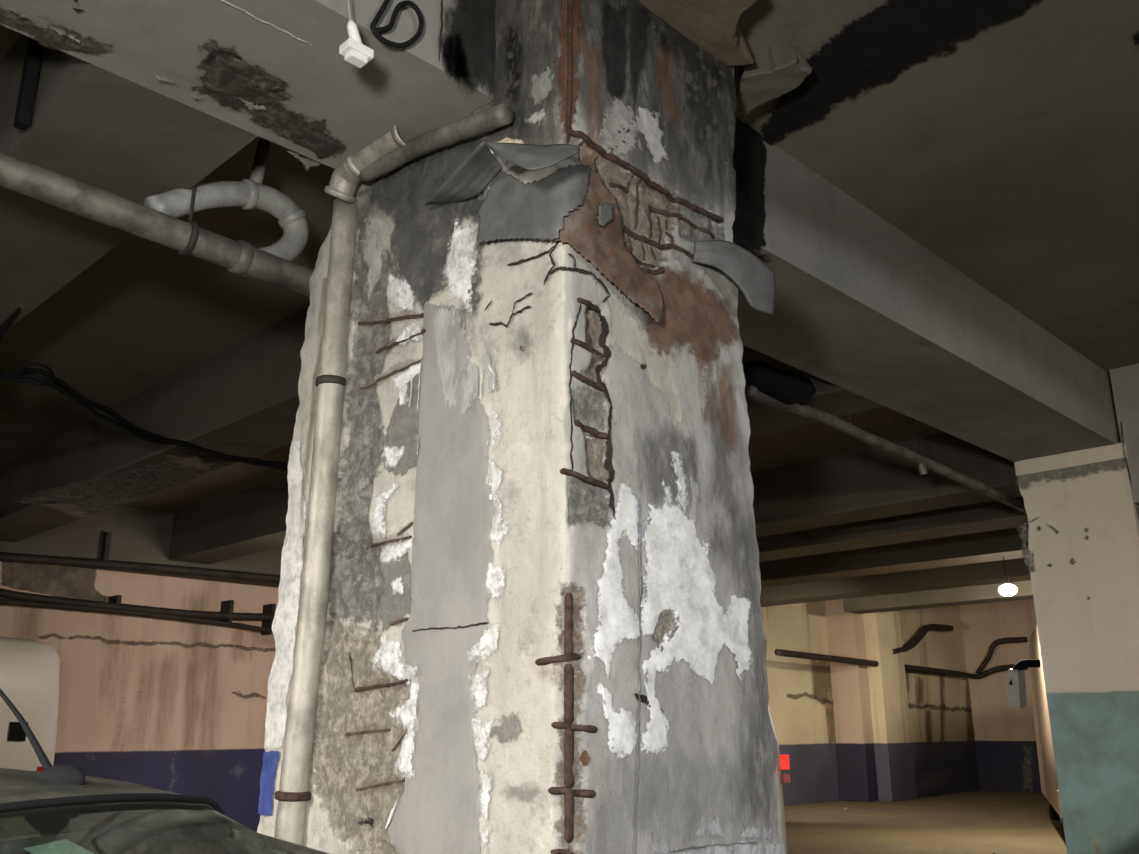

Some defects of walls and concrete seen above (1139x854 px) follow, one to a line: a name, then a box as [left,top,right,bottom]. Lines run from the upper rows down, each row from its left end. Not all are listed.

damp [442,33,471,86]
damp [505,27,522,102]
crack [485,242,610,327]
corrosion [642,266,739,414]
spalling [310,216,426,854]
peeling [535,297,753,854]
crack [39,634,275,652]